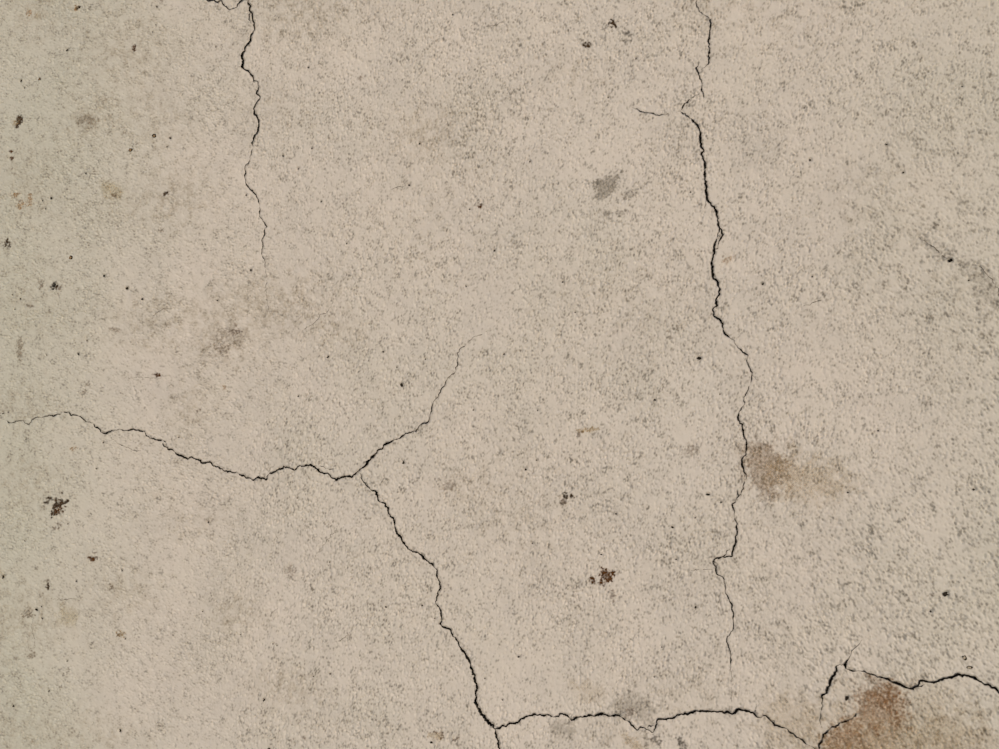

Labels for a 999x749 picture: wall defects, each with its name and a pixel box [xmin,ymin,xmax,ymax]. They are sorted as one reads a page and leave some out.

crack [207,0,270,313]
crack [0,331,999,749]
crack [634,0,757,676]